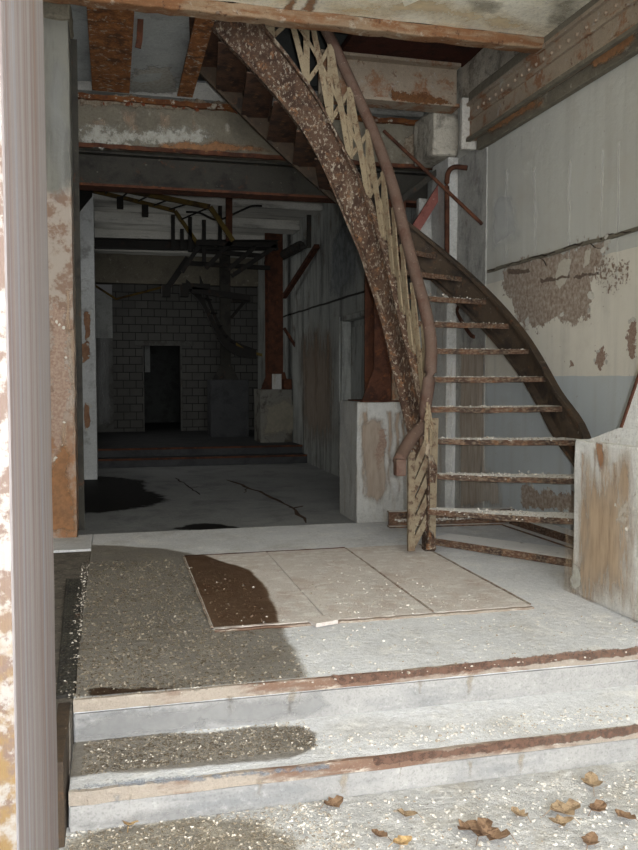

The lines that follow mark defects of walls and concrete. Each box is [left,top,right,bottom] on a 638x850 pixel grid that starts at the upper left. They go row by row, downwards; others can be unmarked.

rust [391,88,451,105]
peeling [501,233,630,335]
peeling [594,346,609,371]
peeling [625,317,637,359]
rust [52,421,75,532]
water stain [362,412,404,501]
crack [228,480,307,523]
water stain [570,454,629,600]
water stain [185,555,278,627]
rust [332,646,638,685]
rust [373,723,638,766]